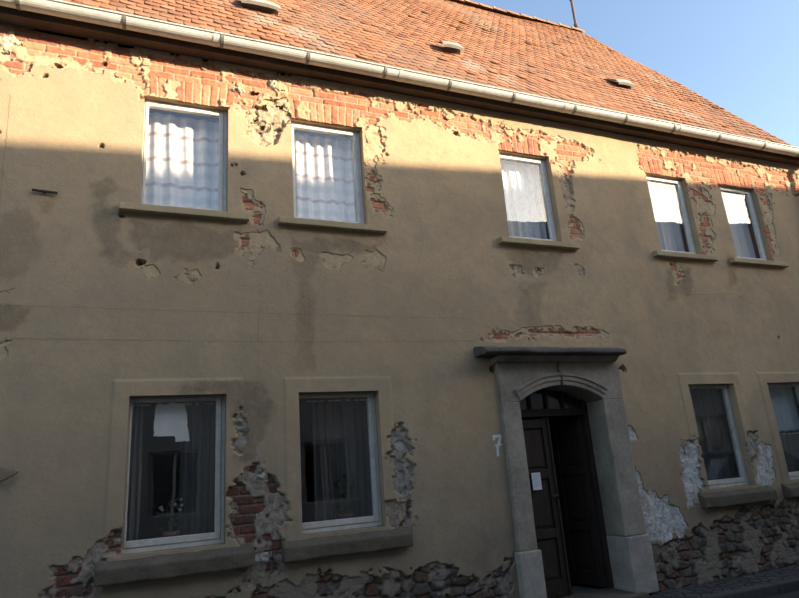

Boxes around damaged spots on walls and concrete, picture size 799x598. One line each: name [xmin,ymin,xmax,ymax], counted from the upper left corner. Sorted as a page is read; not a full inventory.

spalling [0,26,600,240]
flaking render [234,188,305,268]
spalling [635,144,799,258]
spalling [38,528,122,598]
flaking render [205,462,516,598]
spalling [384,423,418,532]
flaking render [636,431,799,591]